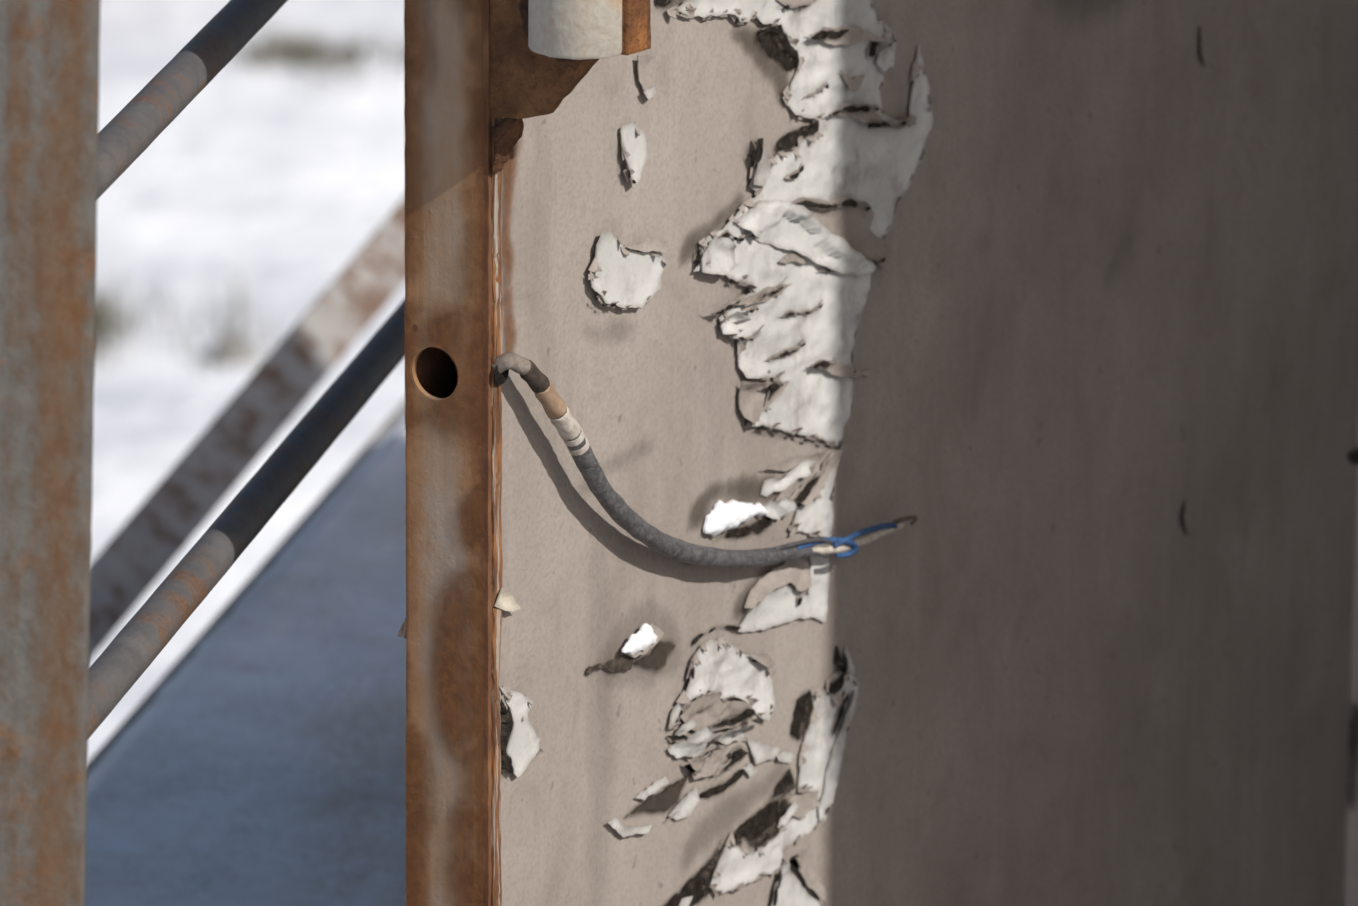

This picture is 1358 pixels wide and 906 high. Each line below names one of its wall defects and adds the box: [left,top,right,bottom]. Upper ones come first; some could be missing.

rust [519,0,528,39]
rust [554,58,583,71]
peeling [620,121,648,187]
peeling [588,231,670,310]
peeling [655,0,934,538]
rust [404,307,484,436]
rust [462,487,484,548]
rust [433,573,484,756]
peeling [586,623,676,675]
peeling [499,685,544,778]
peeling [607,554,859,906]
rust [405,731,430,906]